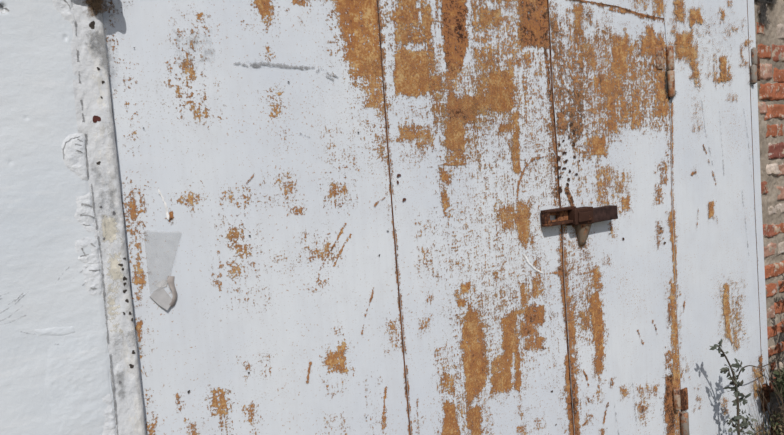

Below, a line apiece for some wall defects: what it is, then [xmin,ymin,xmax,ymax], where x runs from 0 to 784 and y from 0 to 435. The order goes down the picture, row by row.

rust [164,5,221,130]
flaking render [74,192,102,232]
rust [122,177,154,306]
rust [165,180,208,225]
rust [210,0,752,435]
peeling [107,253,133,332]
rust [135,317,149,380]
rust [145,390,158,435]
rust [175,385,263,435]